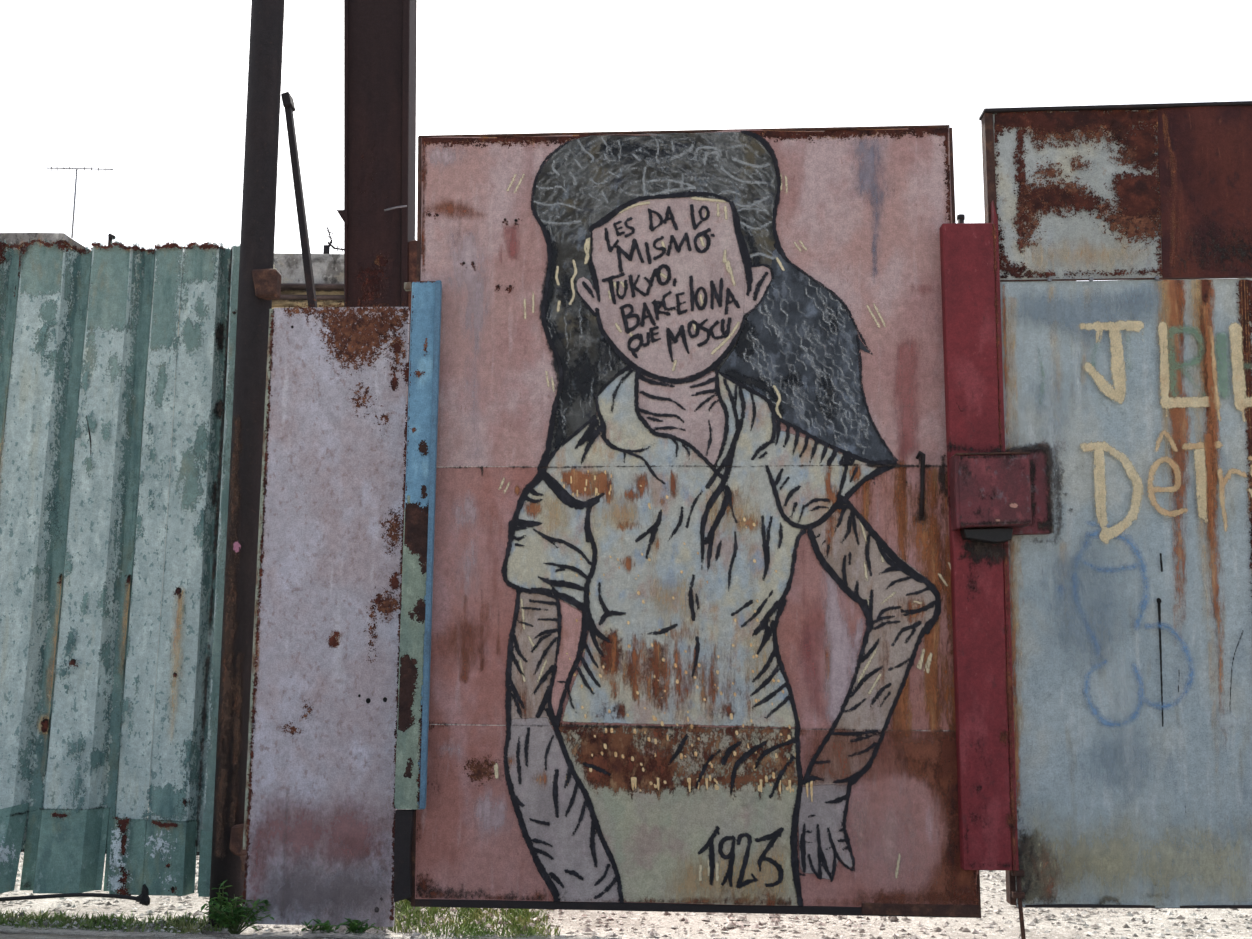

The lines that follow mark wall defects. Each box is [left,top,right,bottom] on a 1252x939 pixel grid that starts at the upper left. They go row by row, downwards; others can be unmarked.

peeling [0,237,240,902]
rust [0,134,657,920]
rust [559,110,1224,906]
rust [1236,279,1252,613]